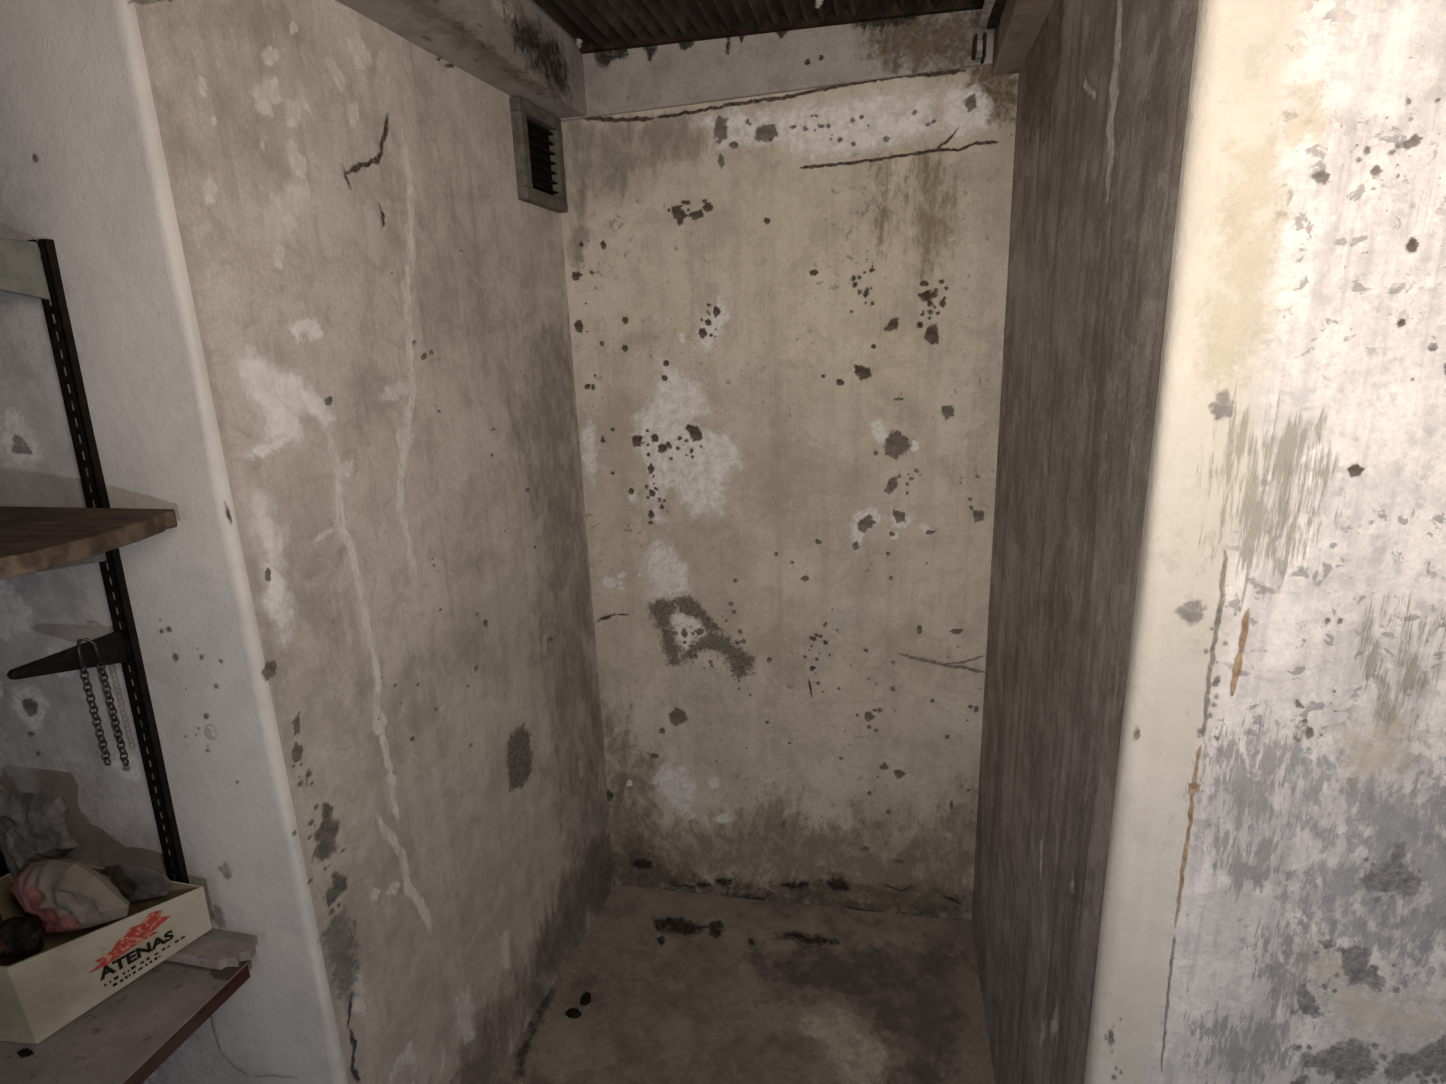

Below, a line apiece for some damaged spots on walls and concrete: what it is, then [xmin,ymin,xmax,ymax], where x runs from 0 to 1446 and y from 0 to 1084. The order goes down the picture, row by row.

crack [344,117,389,187]
crack [800,130,998,169]
water stain [287,317,324,345]
water stain [246,434,291,458]
water stain [251,491,295,646]
water stain [1210,411,1336,605]
crack [901,654,985,673]
corrosion [1231,609,1250,695]
water stain [1362,600,1446,772]
water stain [440,718,976,1084]
corrosion [1175,748,1201,927]
water stain [1191,718,1446,1084]